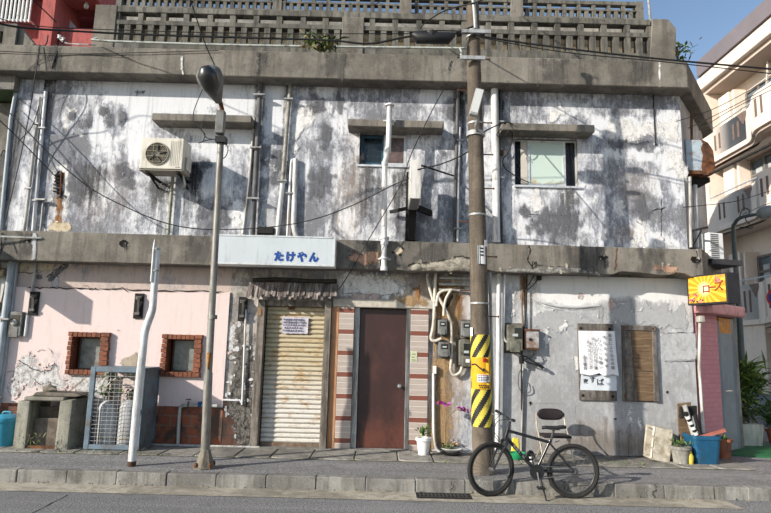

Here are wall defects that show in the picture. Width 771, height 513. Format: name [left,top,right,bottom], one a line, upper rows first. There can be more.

damp [453,92,465,136]
corrosion [54,198,62,223]
damp [83,164,108,218]
damp [189,162,203,202]
damp [359,167,380,213]
crack [28,285,222,293]
peeling [338,251,406,300]
spalling [408,255,470,274]
spalling [653,262,678,273]
peeling [7,348,104,401]
peeling [224,321,255,446]
corrosion [398,279,465,449]